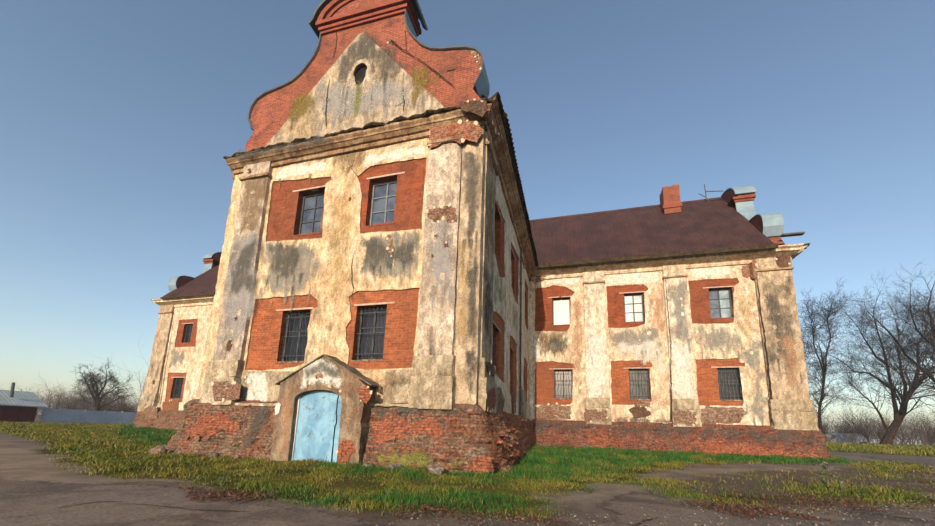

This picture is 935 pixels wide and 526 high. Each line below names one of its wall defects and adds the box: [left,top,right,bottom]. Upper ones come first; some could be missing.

damp [236,34,417,161]
flaking render [184,295,342,442]
damp [224,177,319,336]
damp [360,231,418,277]
flaking render [349,99,500,257]
damp [463,153,479,249]
damp [461,262,493,341]
flaking render [486,203,580,420]
flaking render [606,271,661,328]
flaking render [584,335,747,448]
flaking render [688,261,758,324]
damp [668,277,821,449]